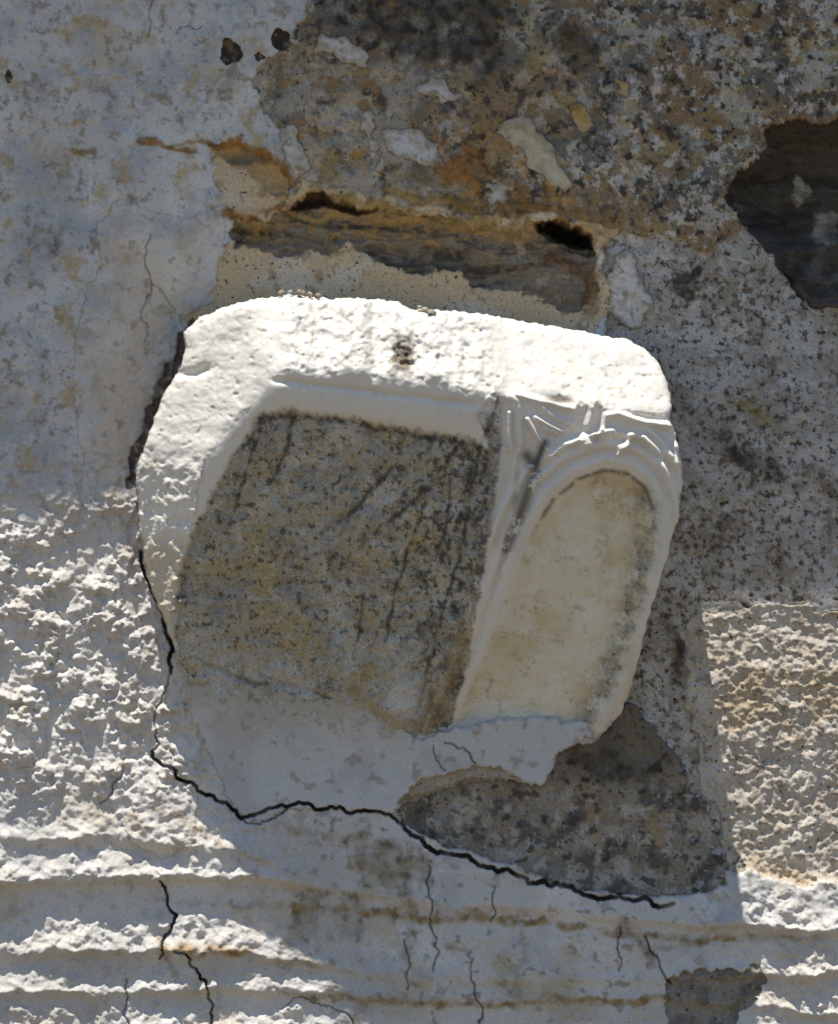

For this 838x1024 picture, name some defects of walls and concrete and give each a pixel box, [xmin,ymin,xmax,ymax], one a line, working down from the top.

rust [137,135,295,189]
rust [223,204,292,222]
peeling [171,0,838,897]
crack [140,552,152,593]
crack [163,623,175,673]
crack [152,752,663,909]
crack [160,881,213,1023]
spalling [664,963,767,1024]